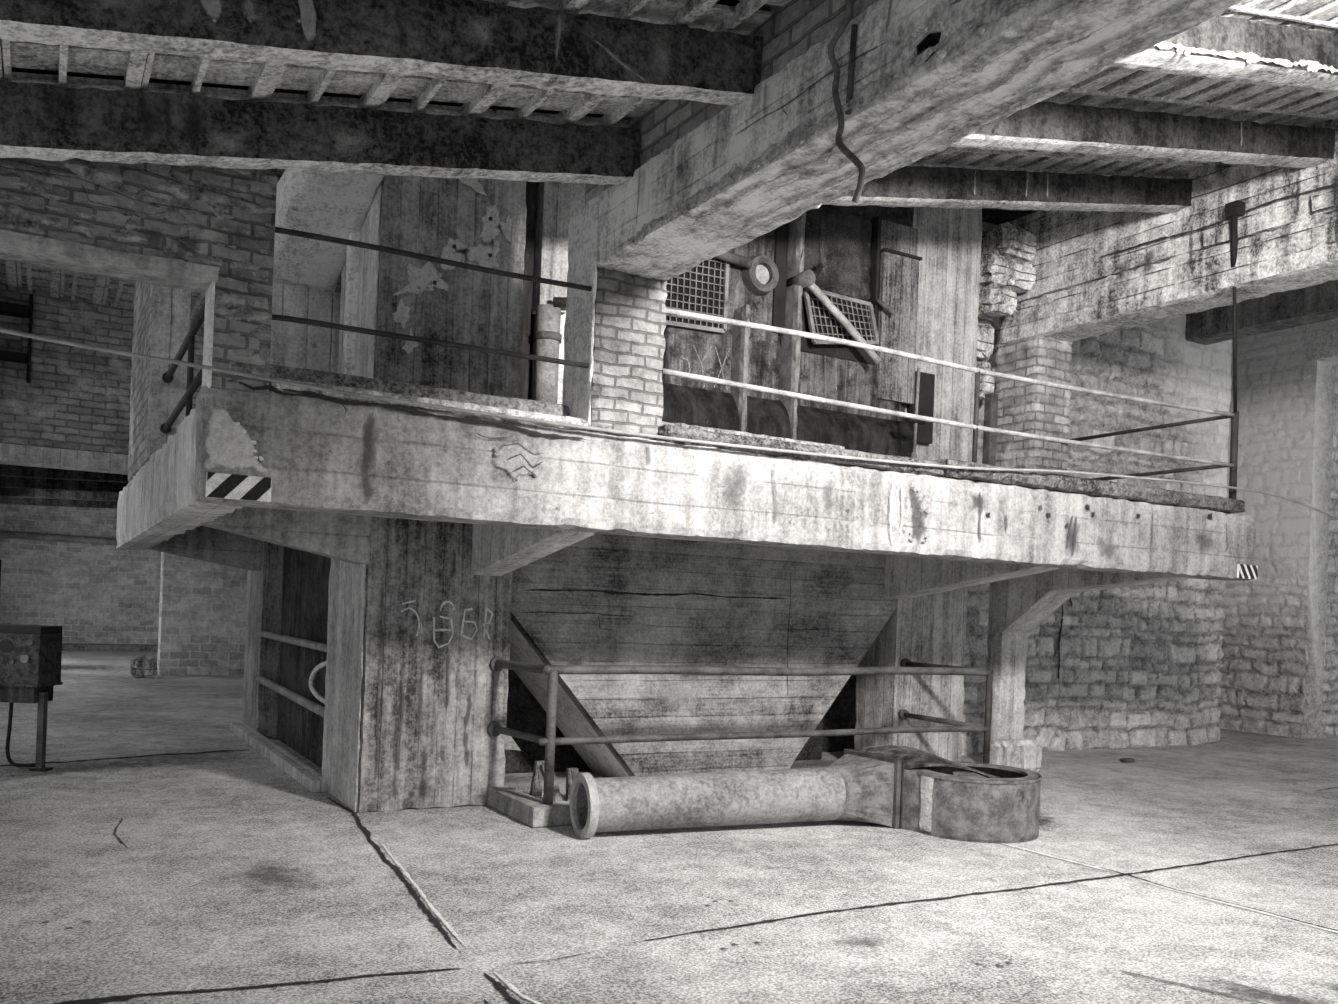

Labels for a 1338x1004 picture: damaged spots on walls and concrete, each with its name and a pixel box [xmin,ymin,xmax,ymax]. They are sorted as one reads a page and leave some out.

peeling [392,178,513,354]
flaking render [205,406,269,473]
damp [396,661,422,767]
damp [464,694,472,766]
crack [53,796,1338,1004]